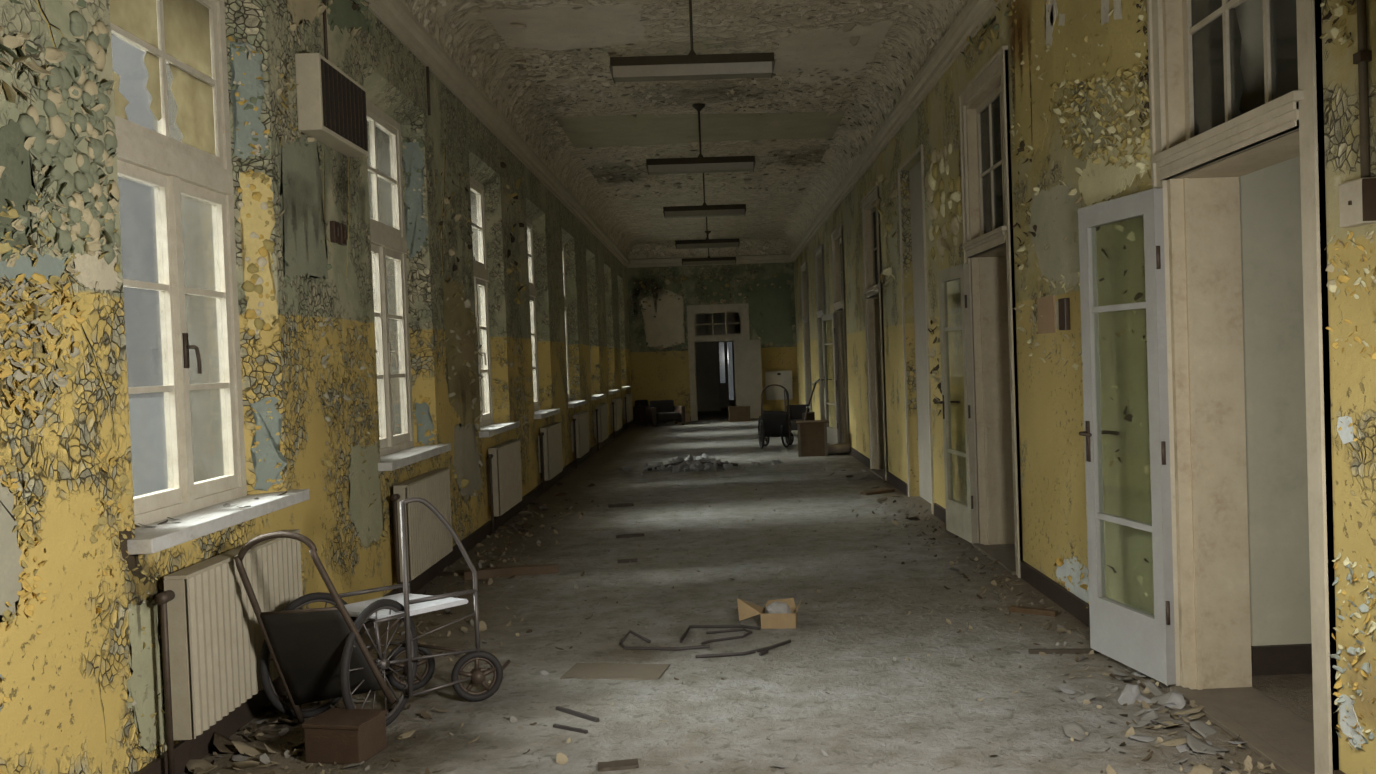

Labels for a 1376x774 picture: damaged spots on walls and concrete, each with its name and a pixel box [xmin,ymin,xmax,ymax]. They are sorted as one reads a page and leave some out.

flaking render [471,3,652,52]
peeling [1320,0,1357,48]
peeling [0,0,124,428]
flaking render [961,0,1154,615]
peeling [1324,230,1376,299]
peeling [1325,311,1376,359]
flaking render [249,395,287,491]
peeling [1337,416,1358,451]
crack [97,622,117,743]
flaking render [1329,551,1376,752]